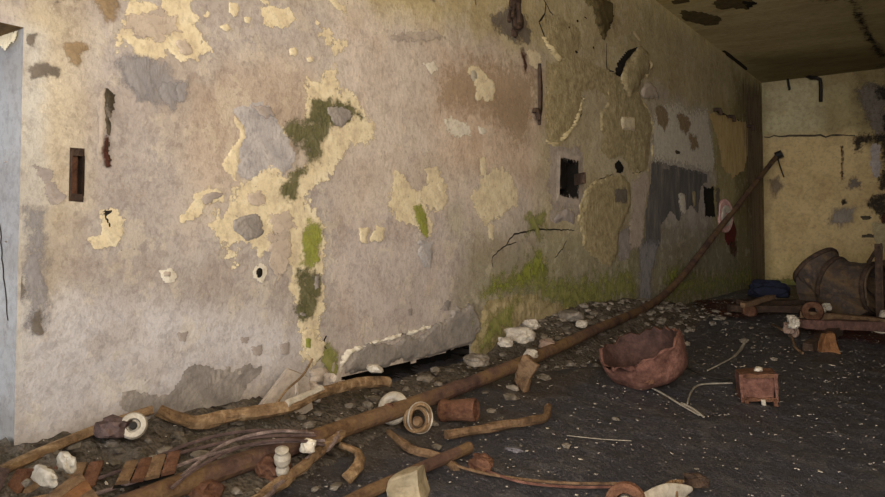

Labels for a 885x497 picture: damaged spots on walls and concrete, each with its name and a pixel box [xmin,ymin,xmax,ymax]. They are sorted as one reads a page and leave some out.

peeling [0,31,37,50]
peeling [29,63,60,79]
peeling [114,0,213,110]
spalling [569,0,614,40]
spalling [671,0,757,26]
spalling [96,88,116,168]
flaking render [545,31,720,267]
leakage [853,82,885,190]
peeling [179,18,570,386]
crack [0,227,8,321]
crack [492,228,574,267]
spalling [119,337,262,417]